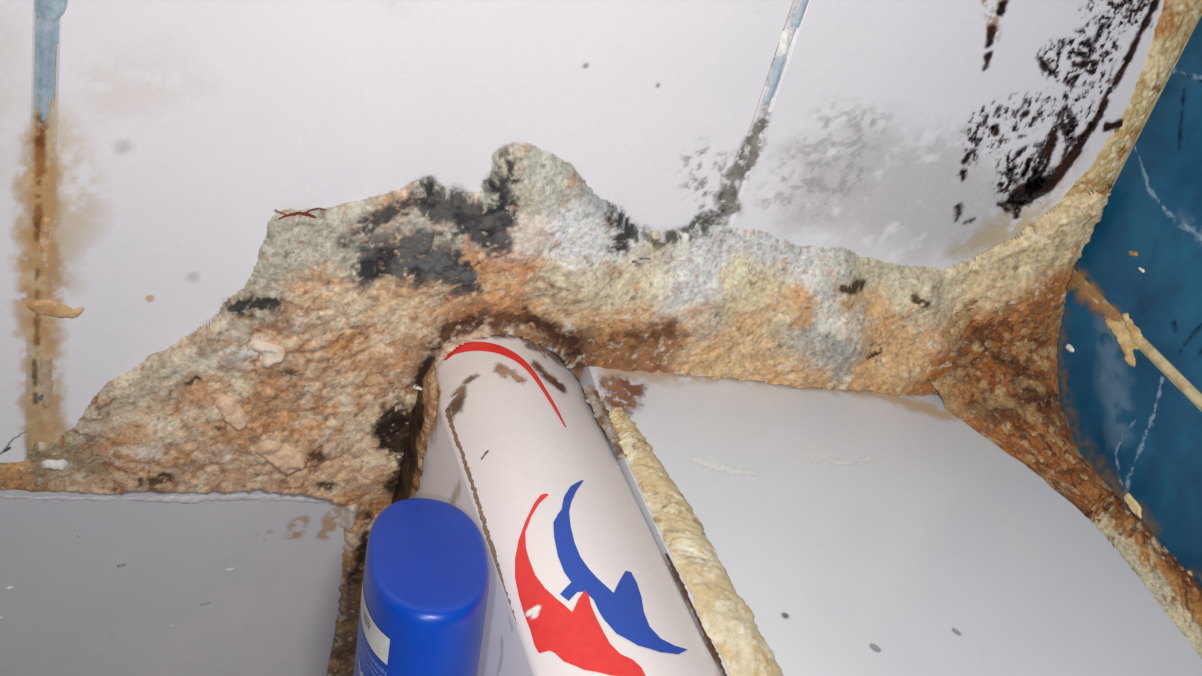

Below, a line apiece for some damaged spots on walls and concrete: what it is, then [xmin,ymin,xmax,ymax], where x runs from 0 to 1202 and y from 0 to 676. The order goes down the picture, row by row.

corrosion [17,116,84,448]
leakage [342,151,519,296]
leakage [605,119,768,252]
leakage [960,0,1159,249]
spalling [24,273,539,531]
leakage [373,306,585,504]
leakage [348,512,372,586]
peeling [1124,493,1142,519]